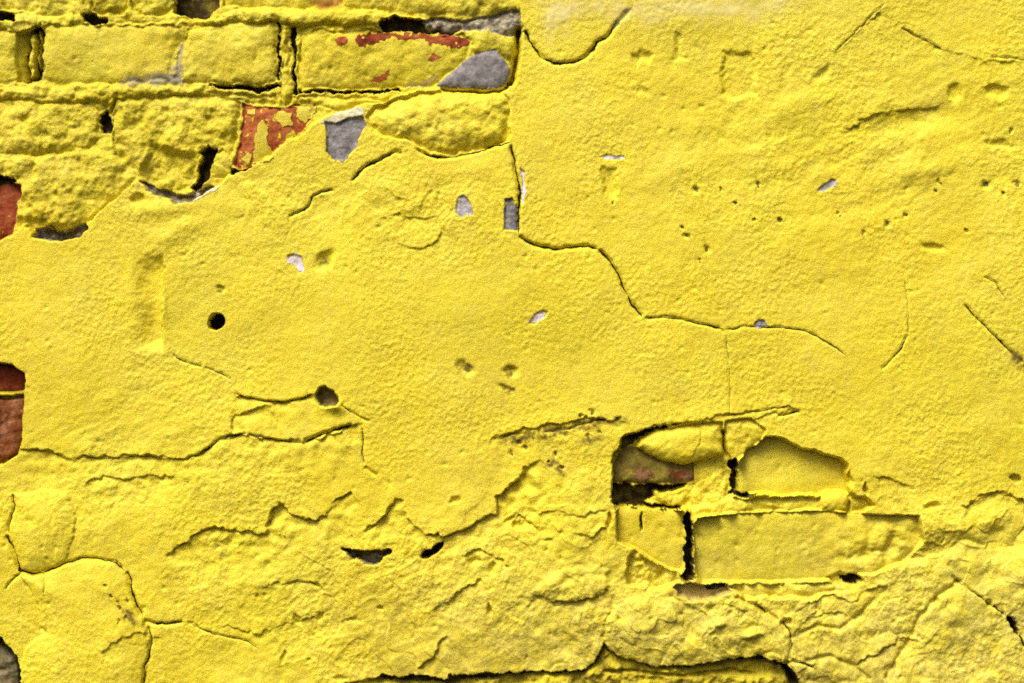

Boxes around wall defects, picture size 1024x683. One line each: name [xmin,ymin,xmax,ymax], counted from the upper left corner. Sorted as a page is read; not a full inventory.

crack [519,7,631,65]
spalling [0,0,522,242]
peeling [503,169,527,230]
crack [288,142,846,458]
crack [963,303,1023,362]
spalling [0,363,202,489]
crack [188,405,375,474]
spalling [170,411,925,601]
crack [4,497,258,682]
spalling [0,637,22,683]